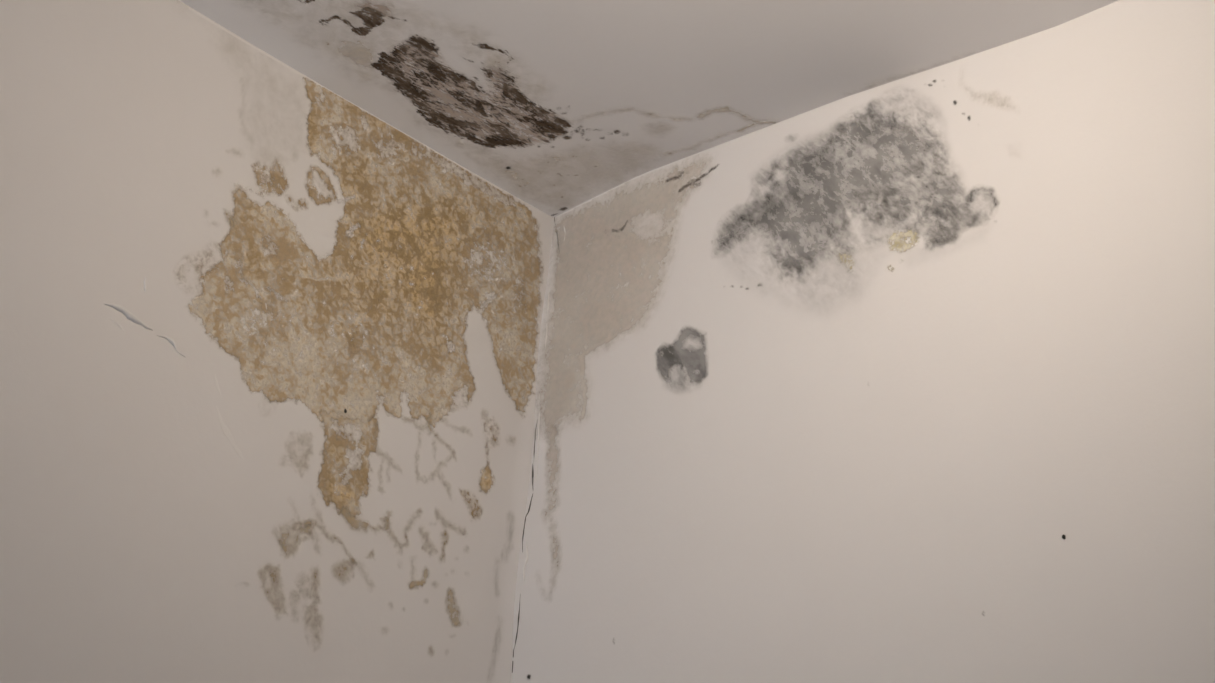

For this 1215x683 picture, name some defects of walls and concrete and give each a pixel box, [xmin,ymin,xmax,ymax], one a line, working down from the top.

leakage [319,4,620,148]
leakage [721,110,997,273]
peeling [104,303,186,358]
leakage [189,80,707,530]